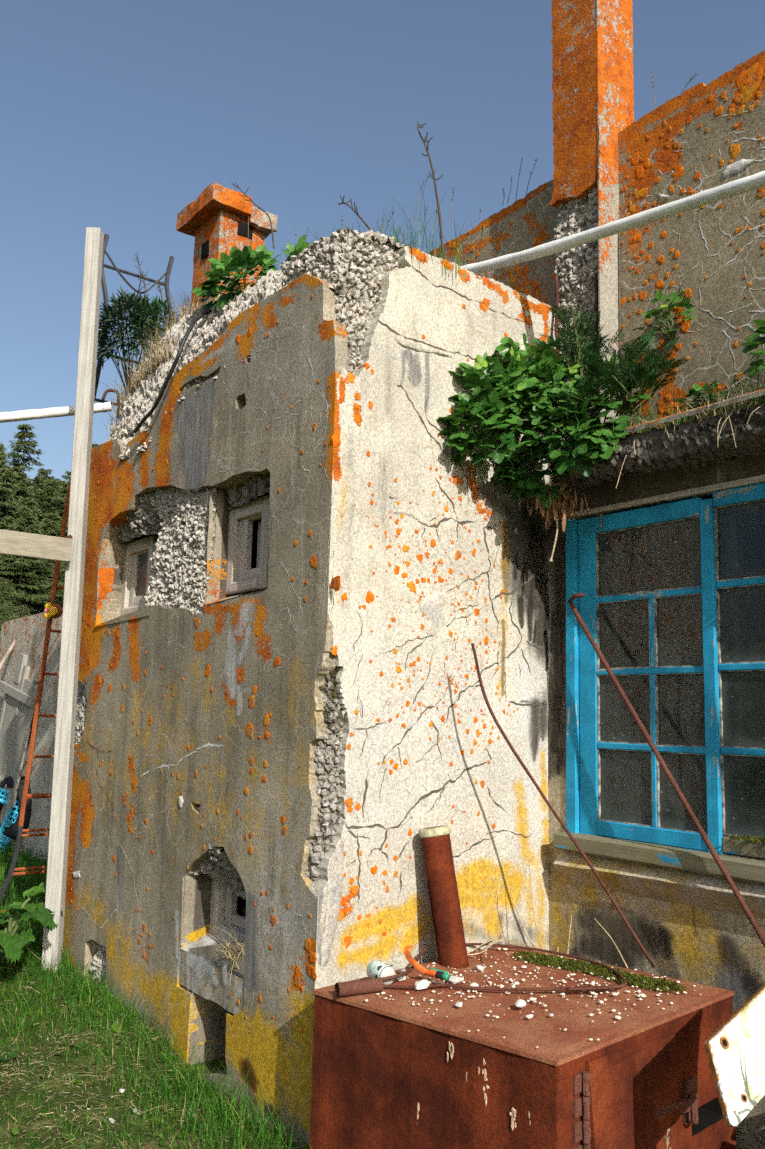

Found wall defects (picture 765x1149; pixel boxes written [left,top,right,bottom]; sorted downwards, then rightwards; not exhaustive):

spalling [278,228,403,374]
spalling [554,180,599,451]
crack [617,109,765,416]
spalling [115,474,270,615]
crack [215,319,543,908]
water stain [502,521,566,774]
spalling [305,666,345,886]
water stain [175,910,227,988]
water stain [244,893,257,989]